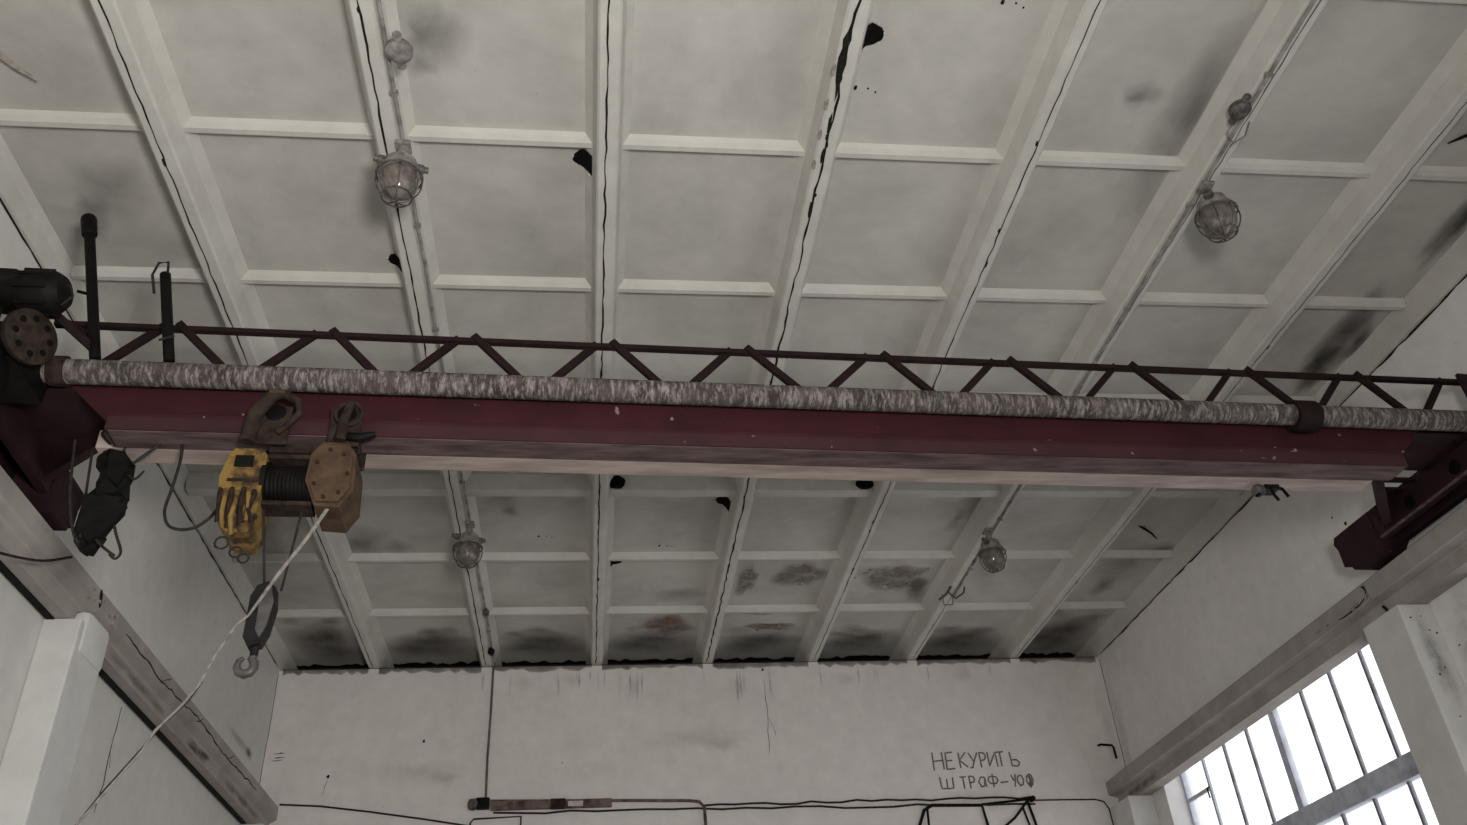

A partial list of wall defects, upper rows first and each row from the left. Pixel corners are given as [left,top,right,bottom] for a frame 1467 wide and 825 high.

crack [600,0,610,378]
crack [769,0,862,385]
leakage [1308,316,1366,384]
crack [594,474,602,663]
crack [706,478,750,662]